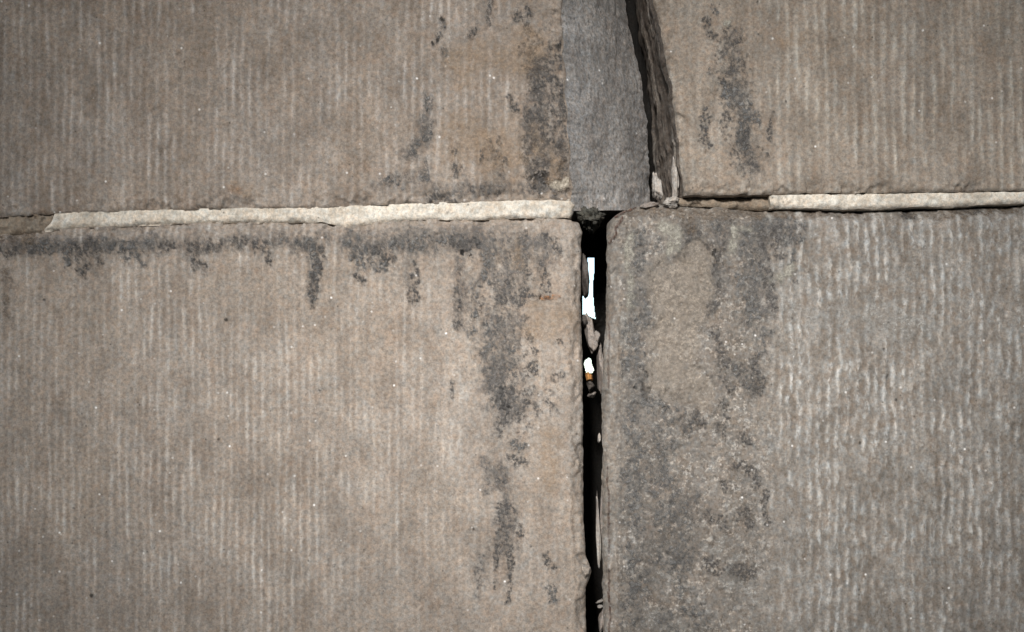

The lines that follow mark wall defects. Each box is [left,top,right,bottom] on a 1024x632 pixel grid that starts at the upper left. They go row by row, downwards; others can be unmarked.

leakage [513,6,532,37]
leakage [406,96,507,203]
leakage [506,40,568,198]
leakage [699,30,772,180]
leakage [0,233,325,309]
leakage [494,230,562,307]
leakage [343,229,536,437]
leakage [617,207,838,632]
leakage [474,500,524,604]